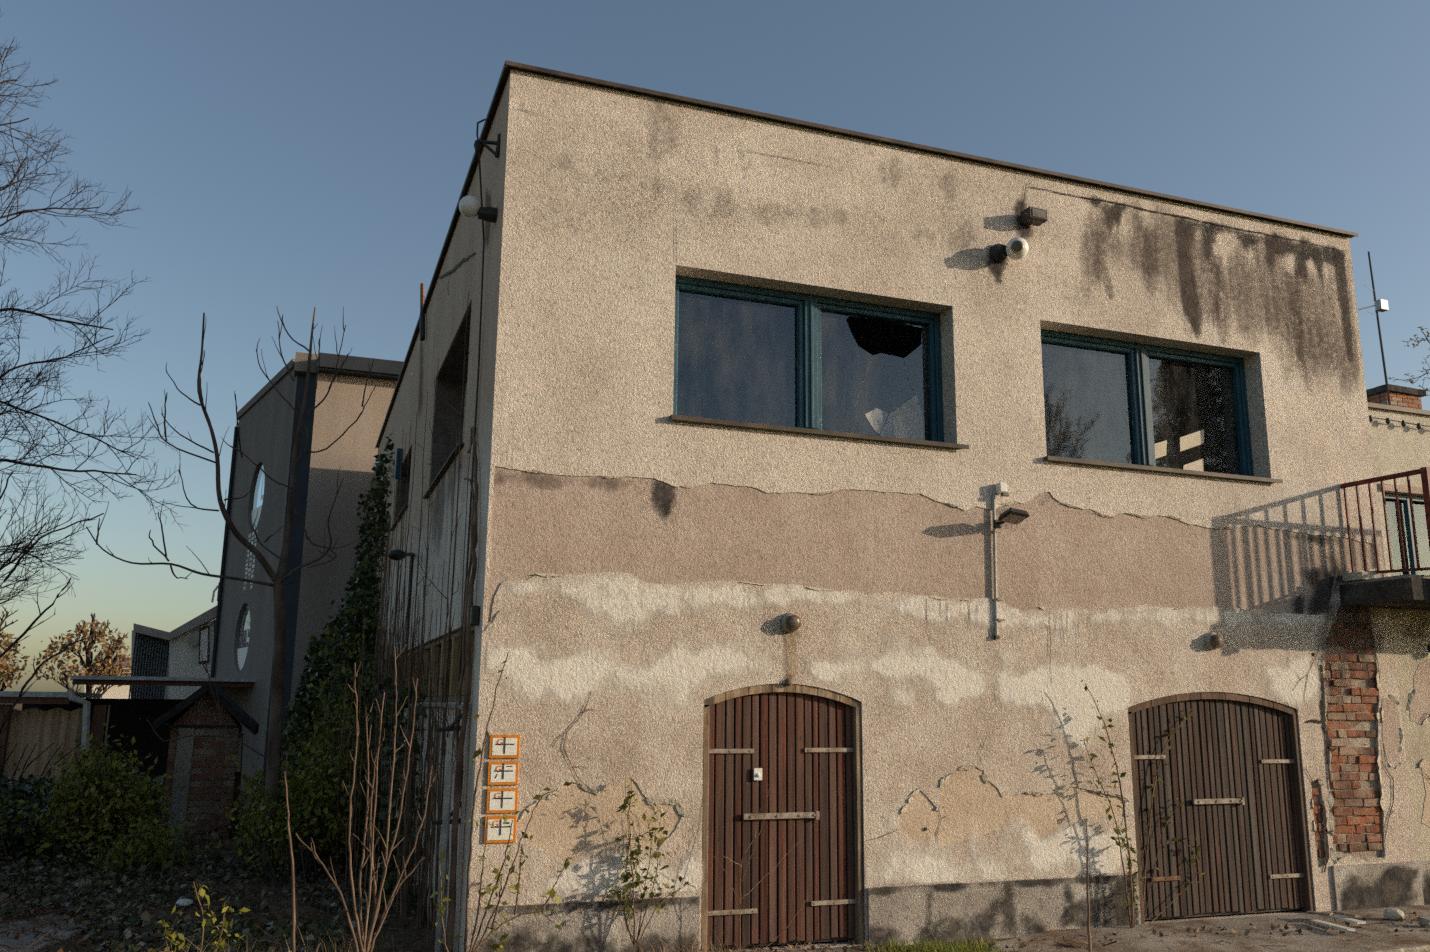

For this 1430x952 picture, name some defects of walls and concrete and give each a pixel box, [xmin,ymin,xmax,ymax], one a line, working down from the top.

damp [1085,197,1359,383]
damp [653,482,675,516]
damp [512,582,539,595]
damp [557,559,1345,631]
damp [486,641,769,706]
peeling [481,466,1430,868]
damp [807,637,1133,749]
damp [1265,657,1322,707]
crack [552,692,596,793]
crack [618,784,667,875]
damp [867,818,1139,943]
damp [1342,866,1430,910]